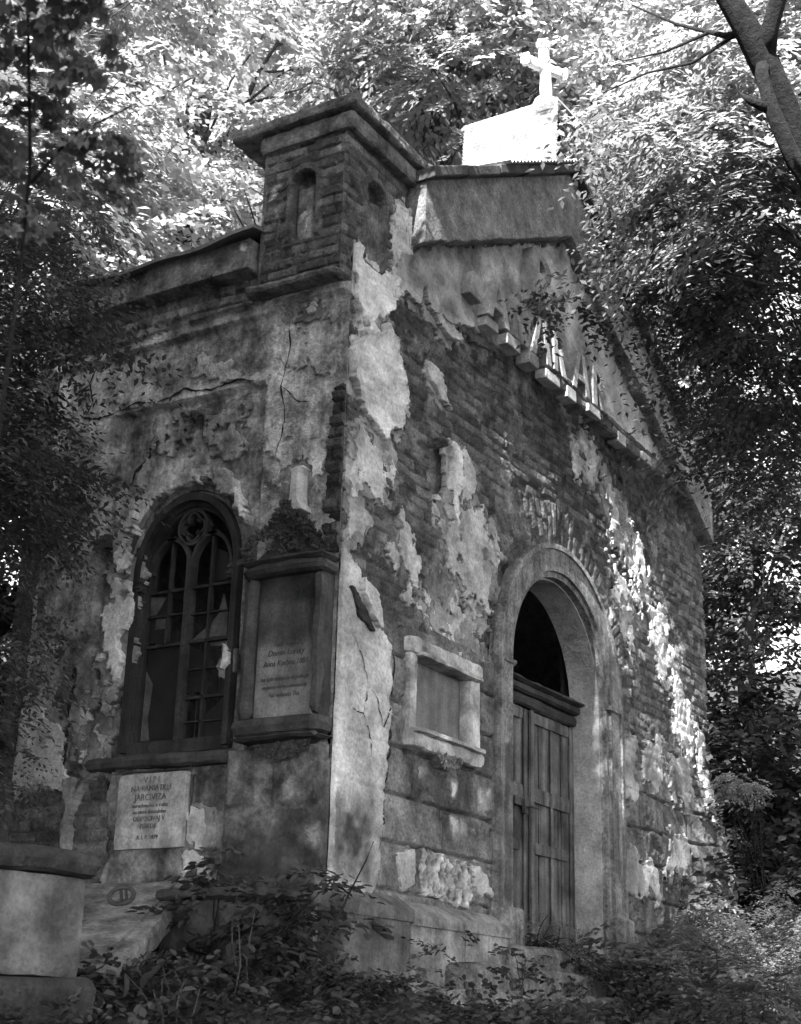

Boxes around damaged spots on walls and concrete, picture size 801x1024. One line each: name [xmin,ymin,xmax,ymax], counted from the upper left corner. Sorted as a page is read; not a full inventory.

flaking render [8,517,151,884]
crack [79,367,255,420]
crack [275,316,309,455]
crack [353,636,395,848]
peeling [102,196,670,893]
peeling [558,402,739,921]